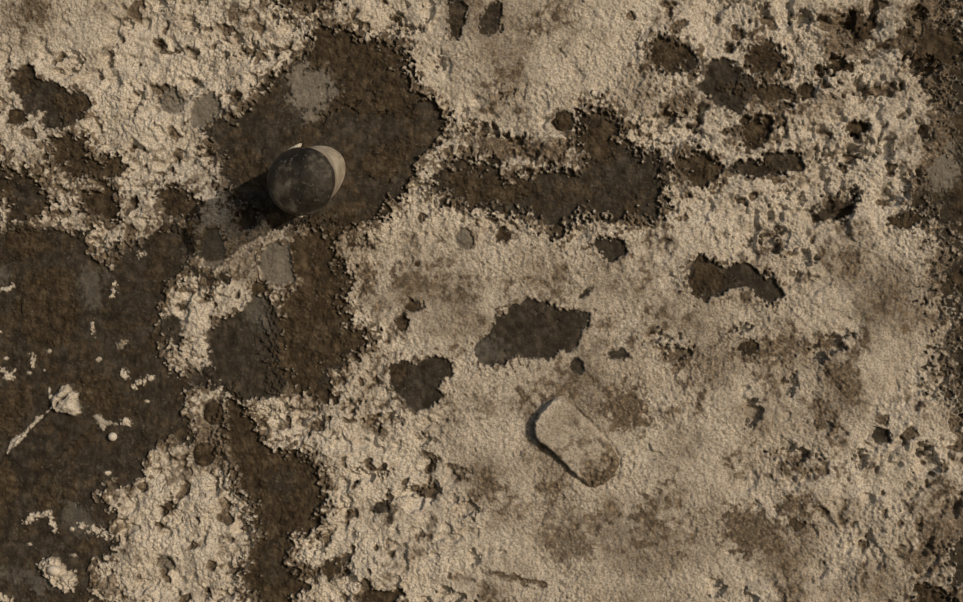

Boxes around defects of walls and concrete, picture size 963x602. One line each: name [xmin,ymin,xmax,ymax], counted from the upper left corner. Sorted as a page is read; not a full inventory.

spalling [823,7,884,77]
spalling [422,32,816,243]
spalling [845,120,872,140]
hole [455,228,476,251]
spalling [886,0,963,424]
spalling [0,19,458,602]
spalling [474,285,594,376]
spalling [686,254,785,308]
spalling [909,534,963,602]